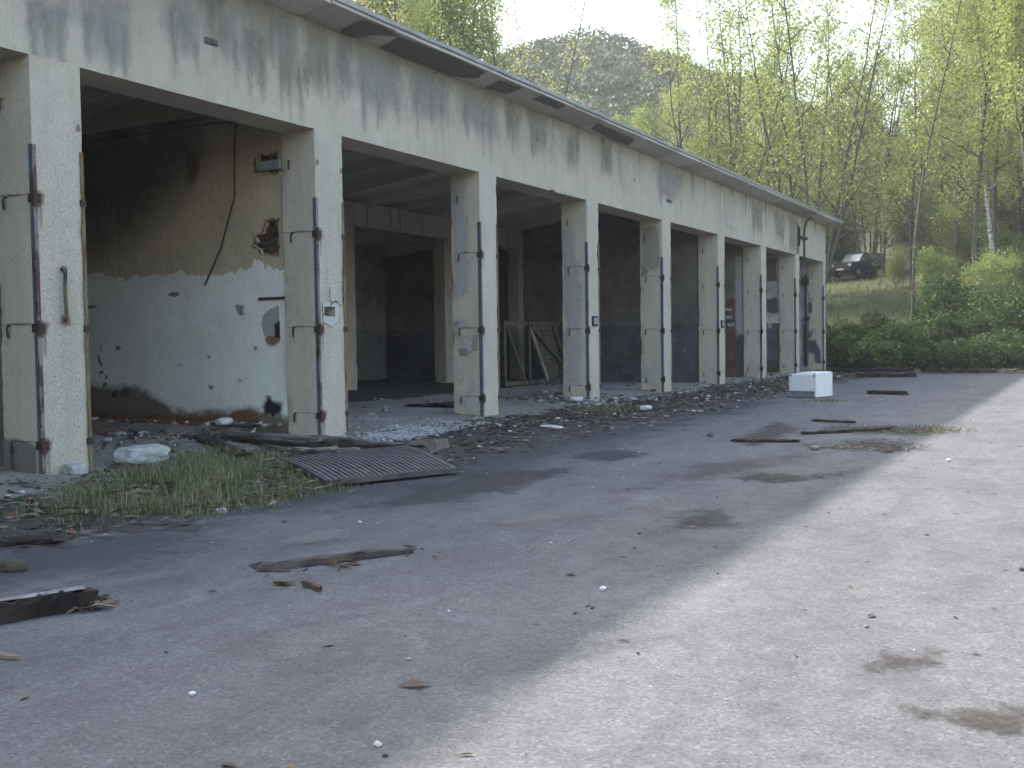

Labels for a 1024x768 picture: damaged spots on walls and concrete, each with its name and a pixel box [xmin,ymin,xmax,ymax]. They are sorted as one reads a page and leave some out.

damp [281,21,484,119]
spalling [253,151,279,175]
damp [465,81,566,147]
damp [592,123,633,166]
peeling [87,218,288,419]
damp [264,397,281,417]